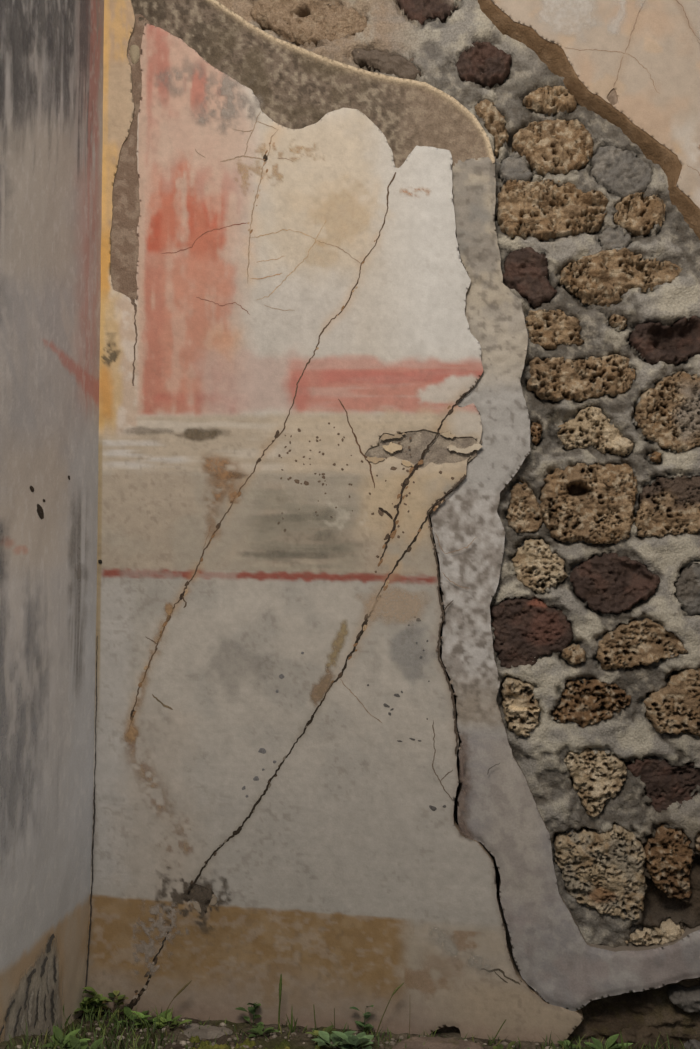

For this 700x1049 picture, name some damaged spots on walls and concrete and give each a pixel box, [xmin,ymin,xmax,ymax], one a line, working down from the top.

flaking render [111,14,150,299]
crack [565,0,656,90]
crack [129,111,396,729]
spalling [216,0,700,948]
crack [184,387,475,901]
crack [127,924,171,1010]
leakage [133,867,230,972]